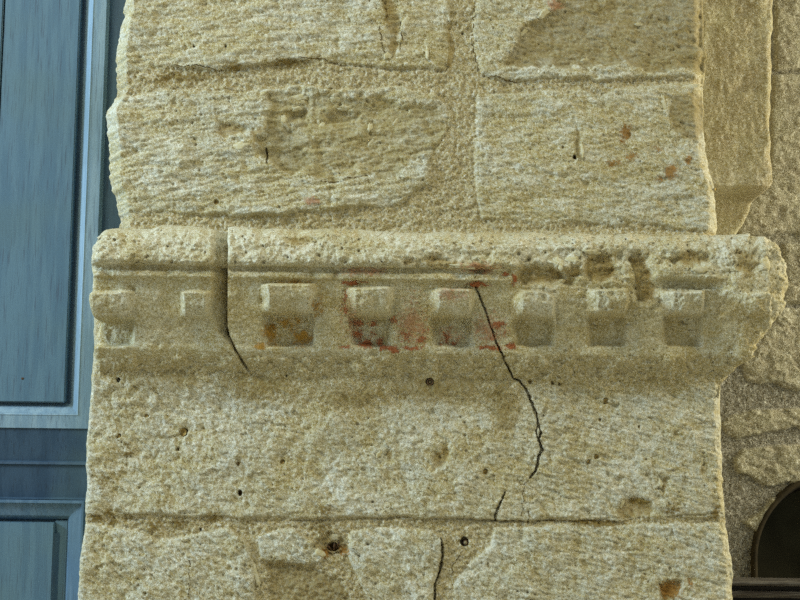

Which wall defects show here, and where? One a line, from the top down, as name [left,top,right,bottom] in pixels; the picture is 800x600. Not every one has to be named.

crack [470,257,636,523]
crack [434,539,461,600]